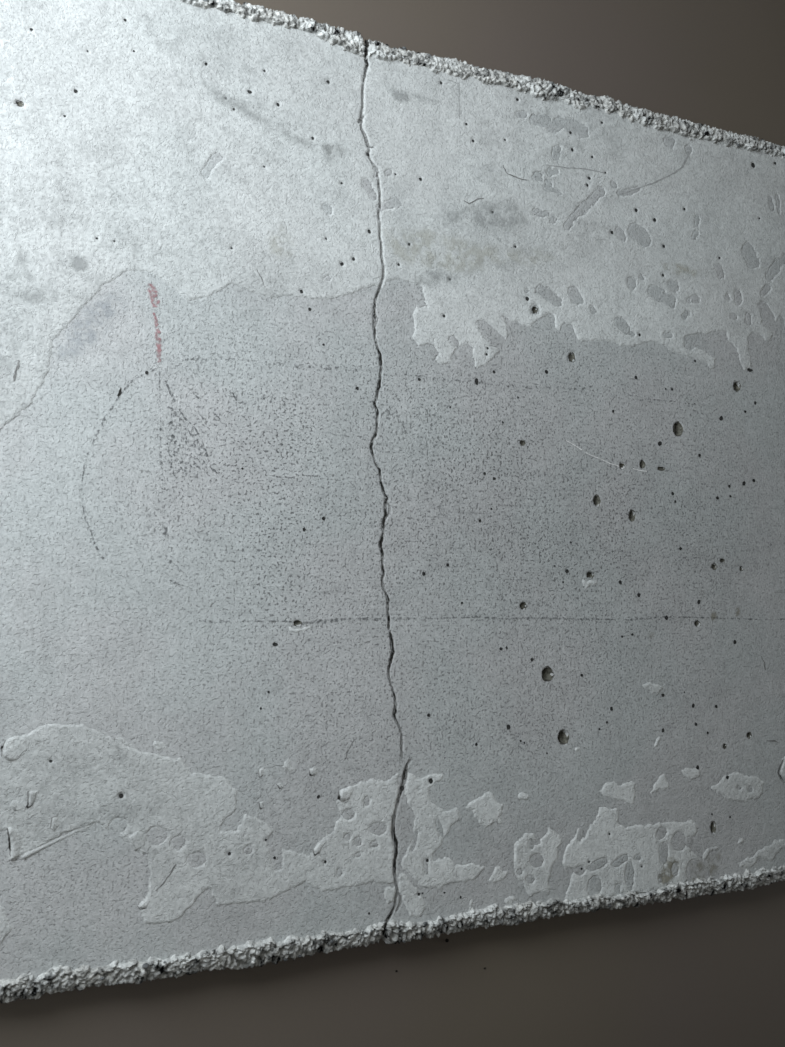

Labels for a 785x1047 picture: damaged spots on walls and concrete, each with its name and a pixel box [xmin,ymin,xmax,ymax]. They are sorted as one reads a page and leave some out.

crack [359,40,411,938]